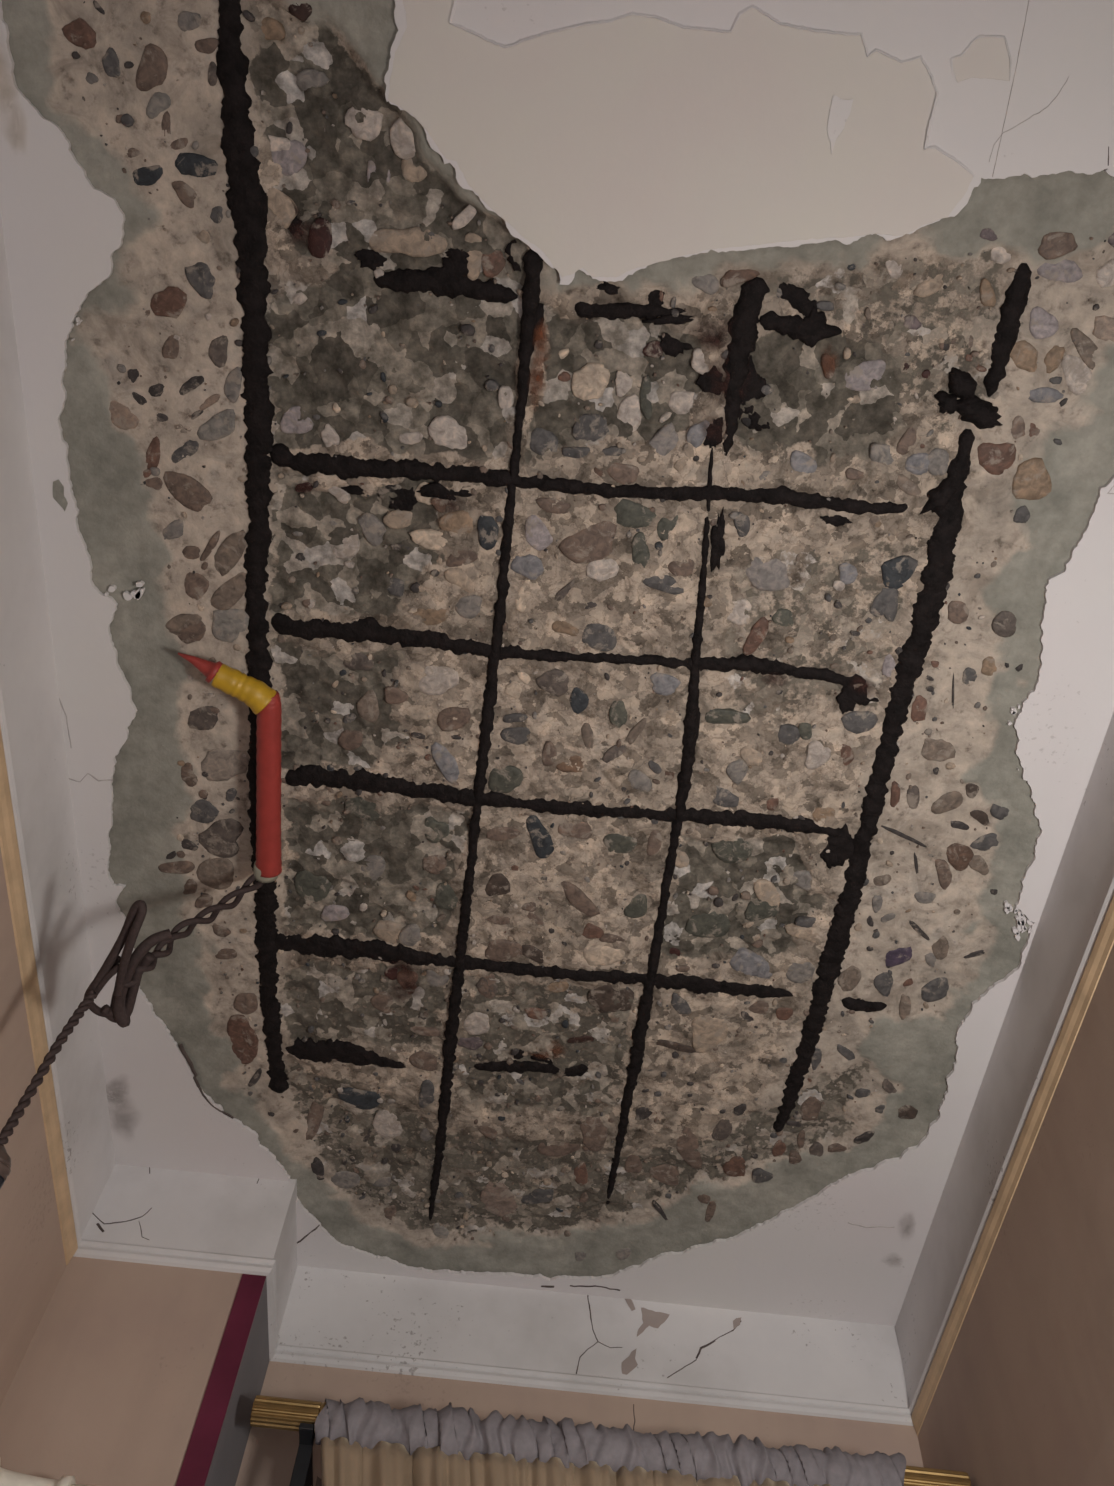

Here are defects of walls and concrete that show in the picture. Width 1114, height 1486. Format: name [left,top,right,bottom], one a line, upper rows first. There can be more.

crack [989,0,1069,177]
rust [701,328,726,349]
spalling [1,0,253,949]
spalling [140,0,1114,1278]
crack [541,1285,622,1374]
peeling [621,1299,670,1375]
crack [667,1322,741,1378]